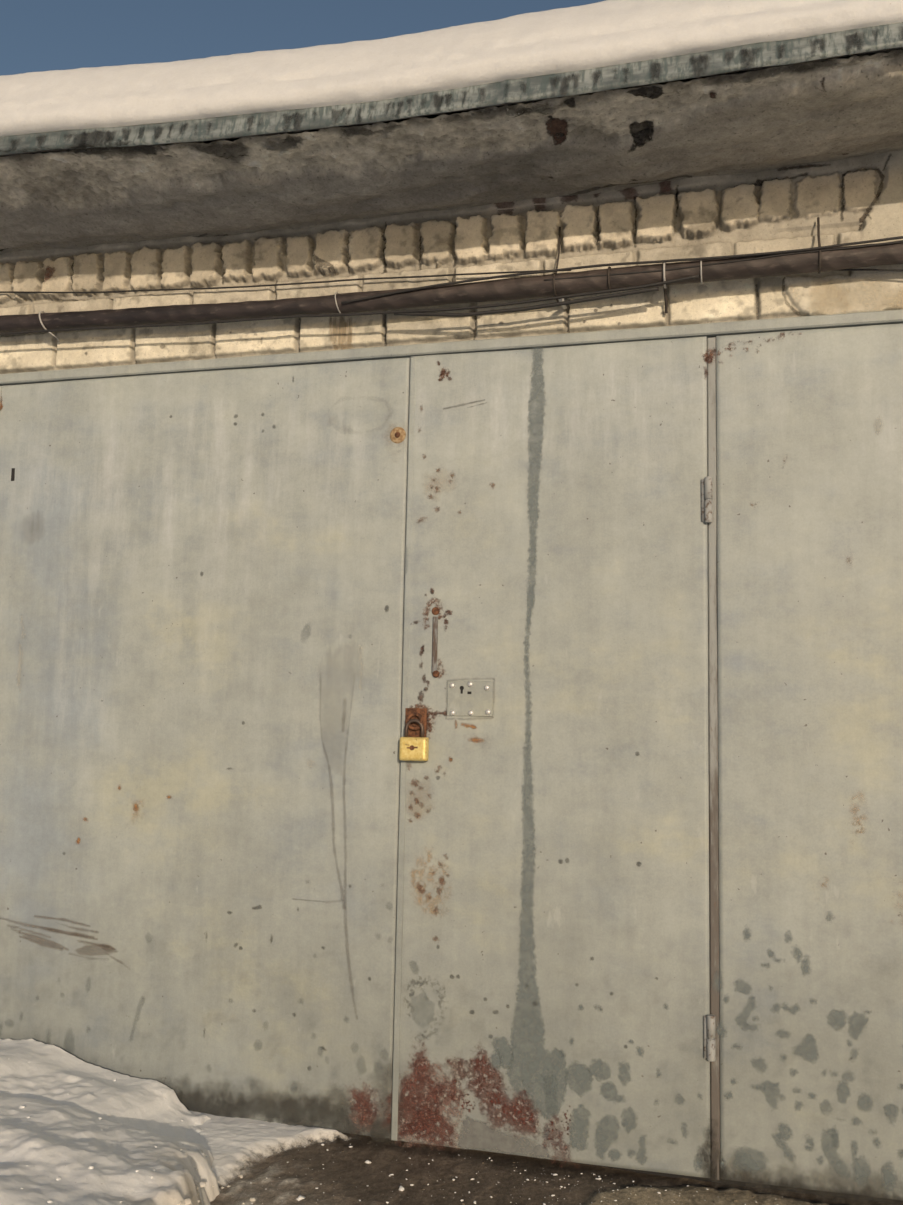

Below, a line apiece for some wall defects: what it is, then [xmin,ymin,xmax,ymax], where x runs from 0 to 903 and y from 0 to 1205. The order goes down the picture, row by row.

spalling [627,86,664,99]
spalling [545,98,575,145]
spalling [629,121,654,152]
crack [734,156,890,230]
corrosion [414,588,451,629]
corrosion [411,645,480,742]
damp [492,347,646,1163]
damp [829,1010,869,1046]
damp [783,1035,818,1075]
damp [835,1073,896,1125]
damp [773,1125,793,1160]
damp [806,1130,896,1188]